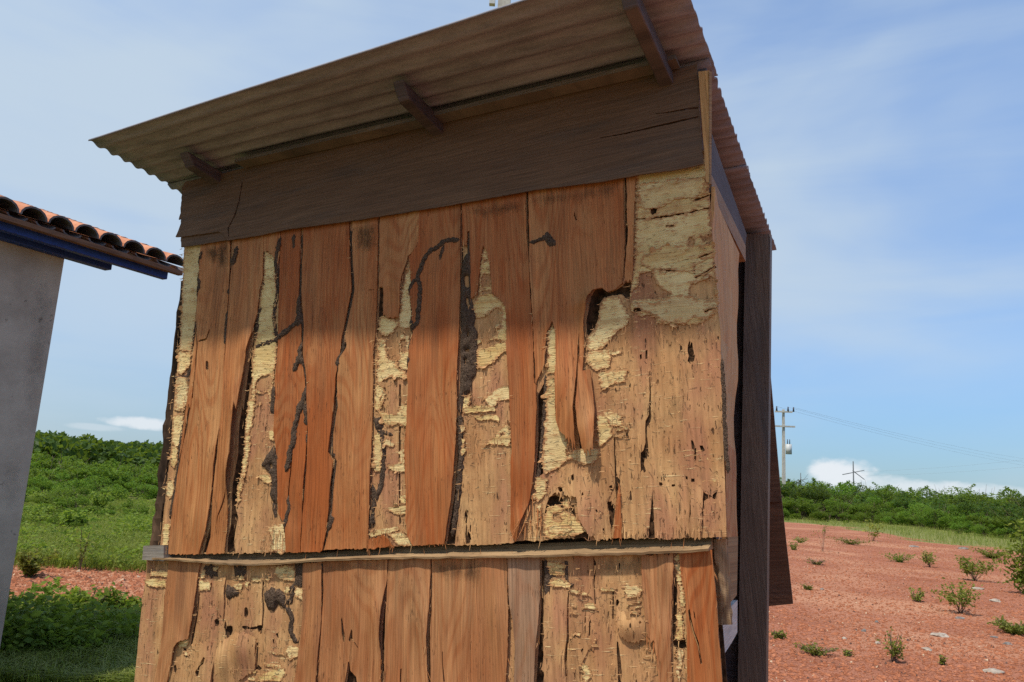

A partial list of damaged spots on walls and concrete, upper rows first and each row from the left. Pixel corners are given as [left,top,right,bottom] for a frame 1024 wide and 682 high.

peeling [161,245,201,499]
peeling [229,249,278,508]
peeling [368,263,413,546]
peeling [454,247,513,493]
peeling [525,325,632,539]
peeling [580,150,720,403]
peeling [198,567,220,609]
peeling [198,621,299,682]
peeling [230,522,303,610]
peeling [546,561,656,682]
peeling [667,554,686,682]